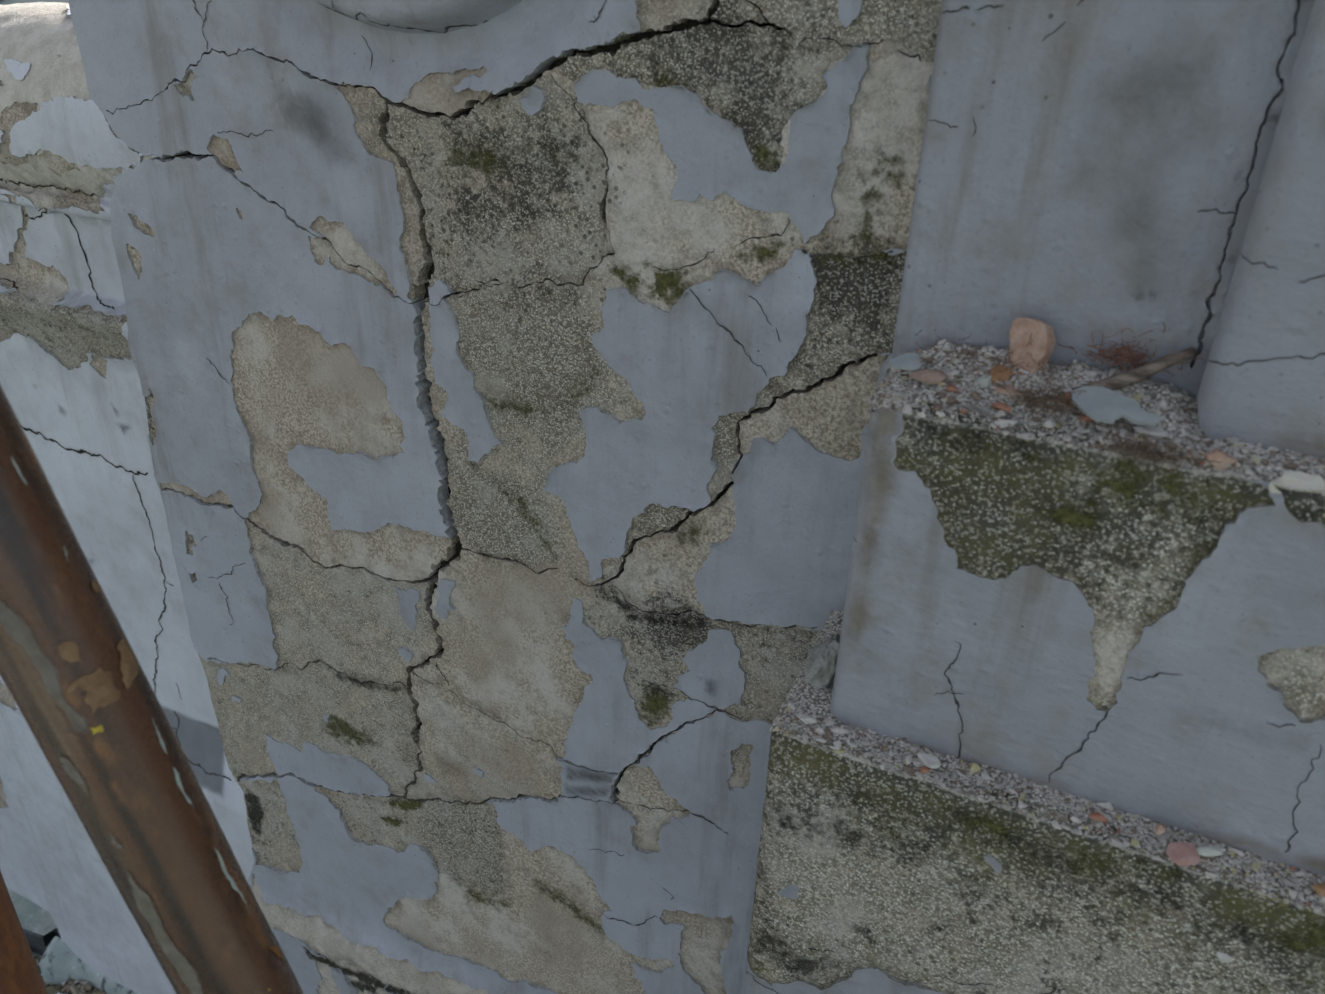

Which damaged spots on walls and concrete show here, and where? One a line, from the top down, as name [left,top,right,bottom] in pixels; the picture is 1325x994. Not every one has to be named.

crack [400,0,922,116]
peeling [0,2,155,377]
crack [422,262,456,302]
crack [654,222,893,418]
crack [22,427,181,715]
peeling [145,394,156,443]
crack [432,541,463,593]
peeling [198,0,942,994]
crack [674,481,734,526]
peeling [894,403,1325,720]
peeling [0,680,17,709]
peeling [748,727,1325,994]